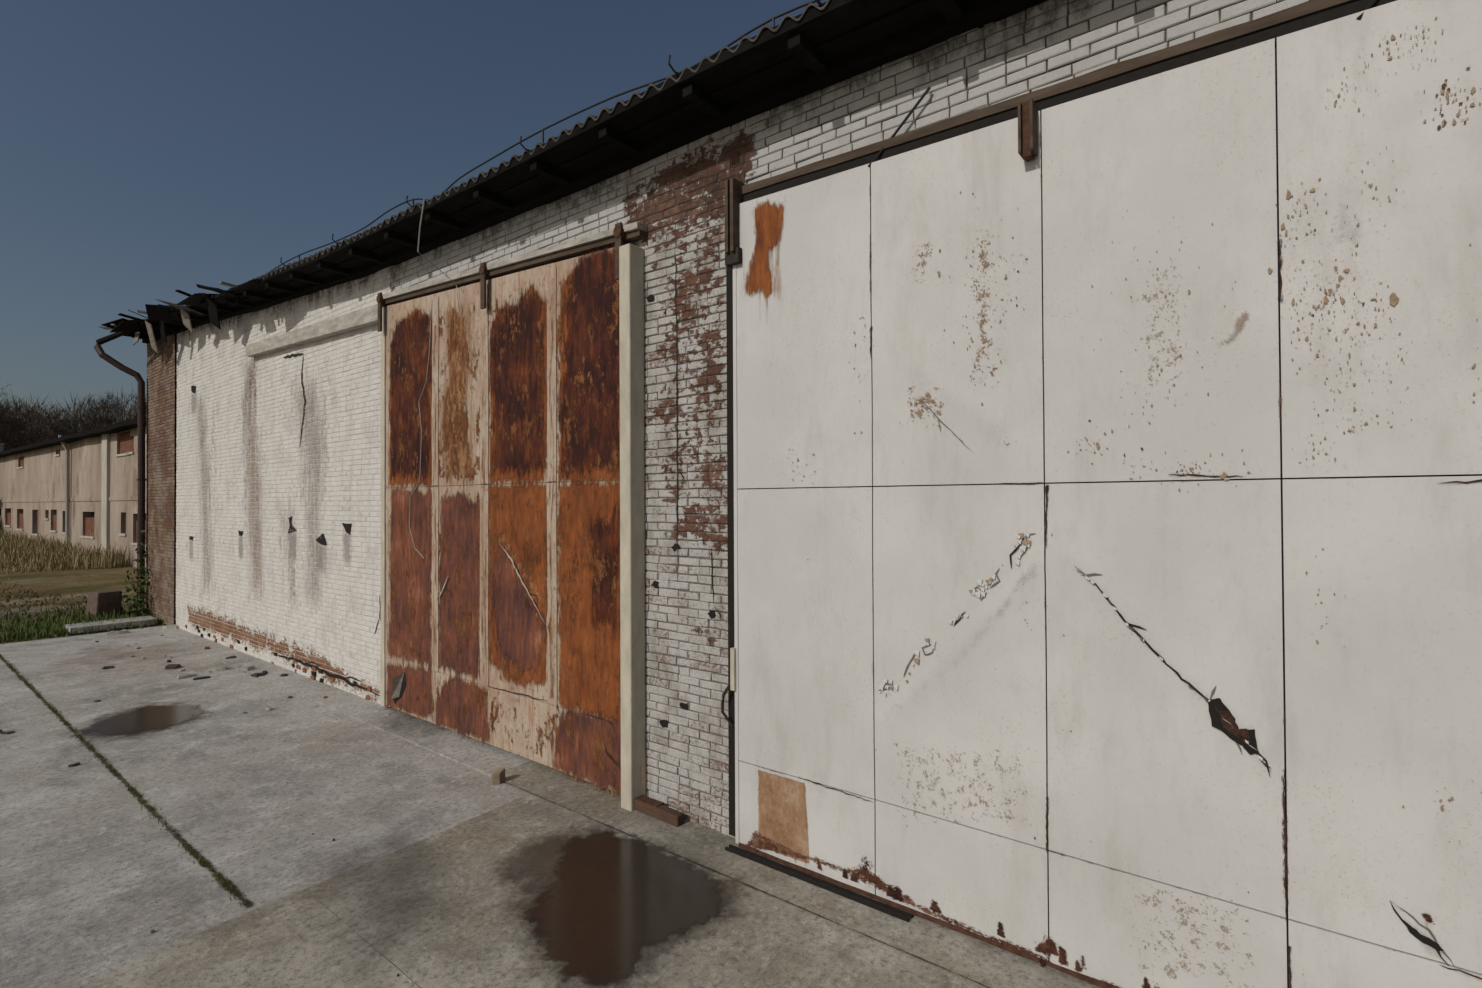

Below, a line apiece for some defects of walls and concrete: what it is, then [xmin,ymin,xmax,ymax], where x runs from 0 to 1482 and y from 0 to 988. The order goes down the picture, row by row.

rust [745,200,784,298]
rust [386,243,664,808]
spalling [185,606,379,701]
crack [1076,567,1271,776]
rust [746,768,1120,988]
peeling [1390,900,1454,966]